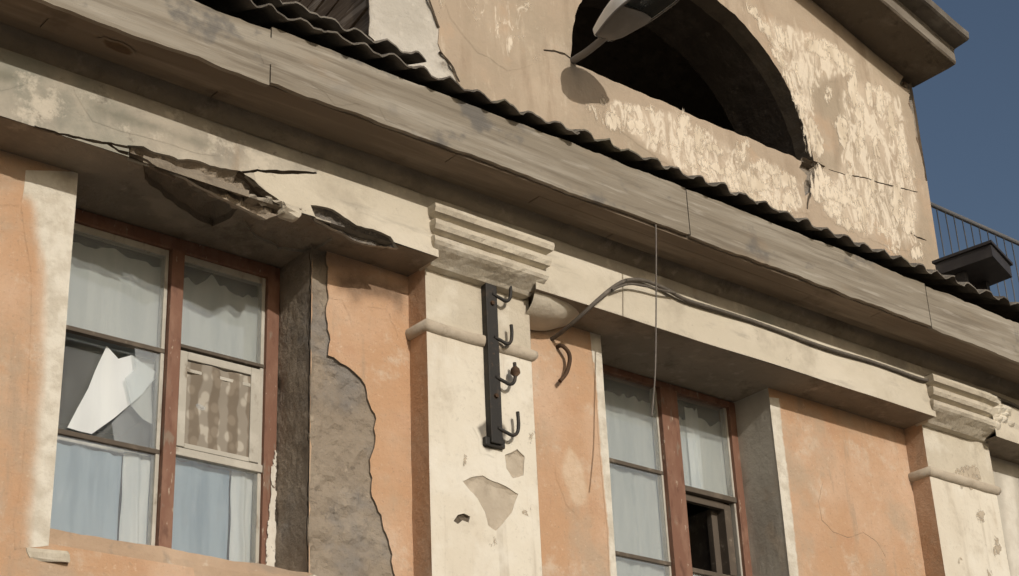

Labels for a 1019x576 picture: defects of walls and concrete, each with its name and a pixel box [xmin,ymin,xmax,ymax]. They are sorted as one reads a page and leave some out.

peeling [368,0,458,82]
peeling [585,3,927,260]
crack [829,169,916,192]
spalling [127,145,398,576]
spalling [454,514,470,524]
spalling [463,449,531,547]